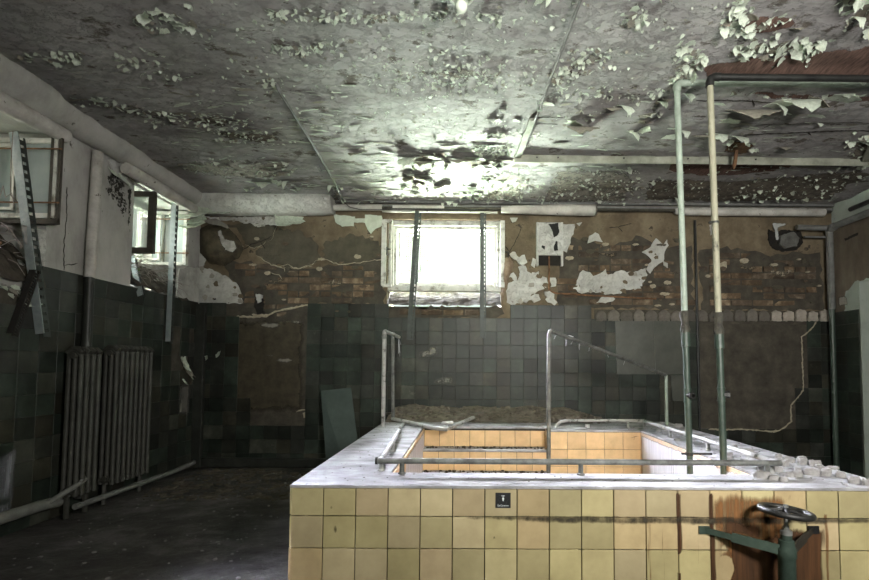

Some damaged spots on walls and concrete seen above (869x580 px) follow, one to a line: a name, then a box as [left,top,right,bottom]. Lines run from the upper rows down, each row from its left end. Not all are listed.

peeling [68,0,869,207]
flaking render [168,207,824,318]
flaking render [833,216,869,312]
corrosion [709,494,829,580]